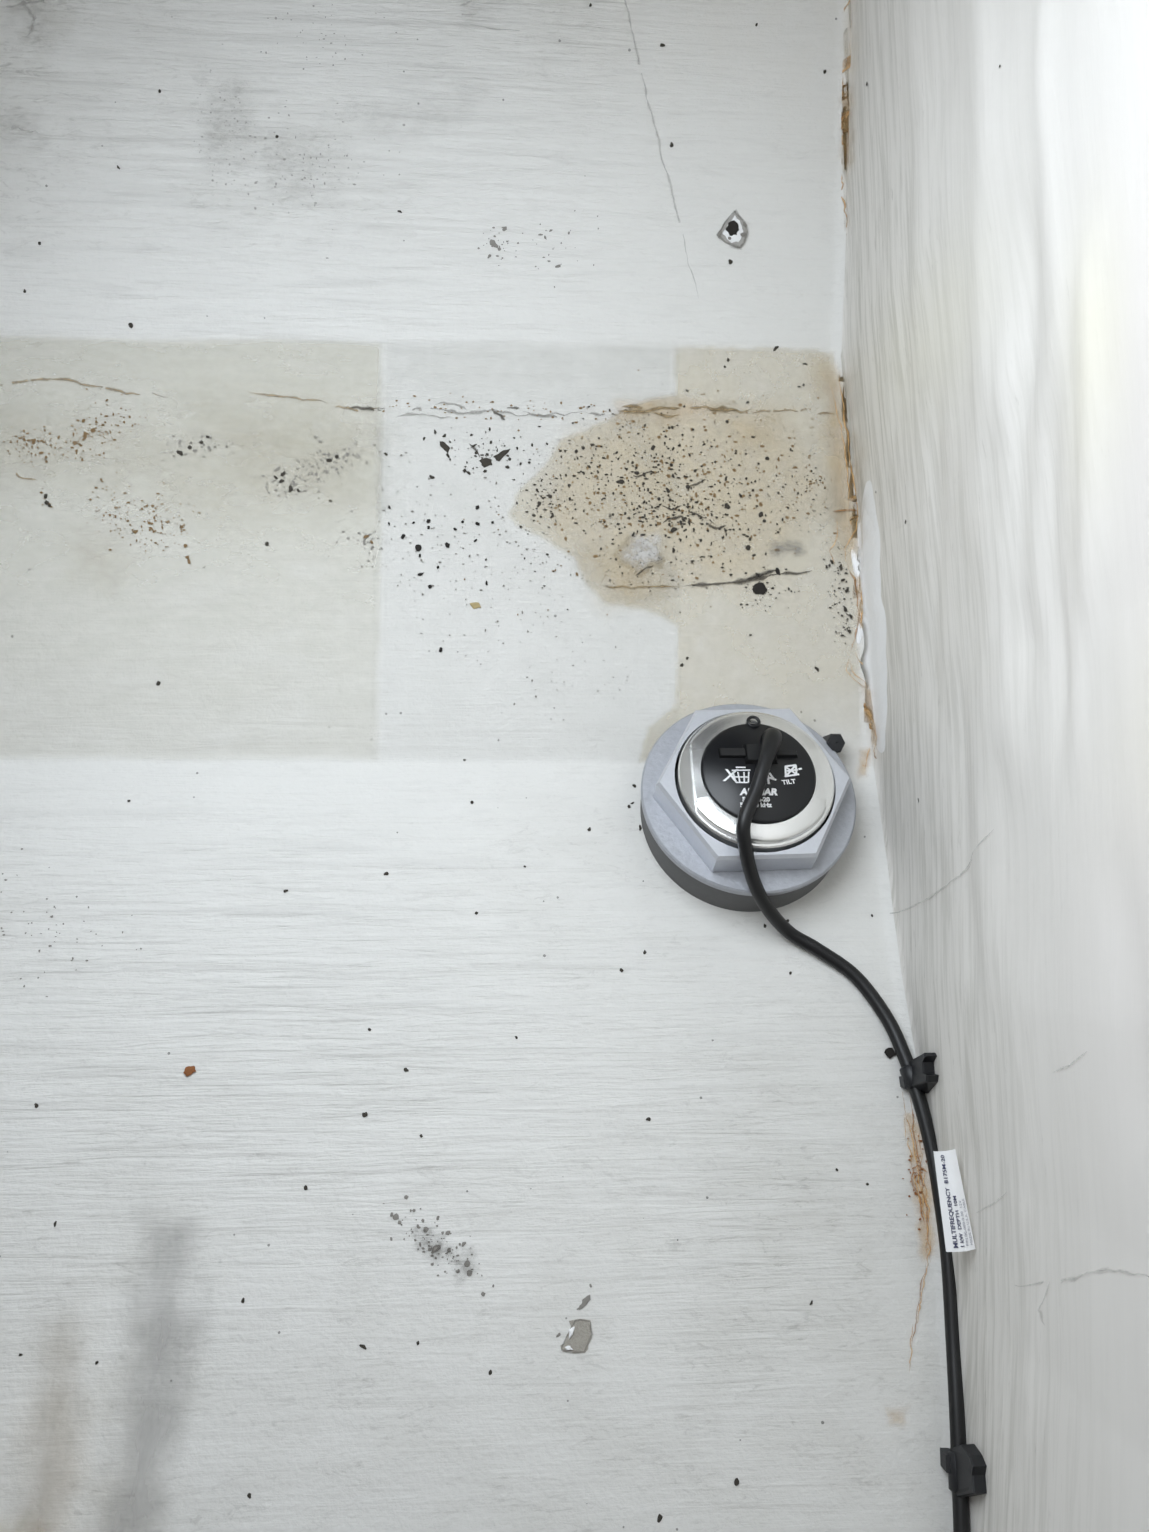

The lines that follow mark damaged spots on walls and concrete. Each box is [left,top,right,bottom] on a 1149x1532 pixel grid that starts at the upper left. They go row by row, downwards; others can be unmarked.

rust [841,54,851,145]
crack [12,378,162,397]
crack [251,392,835,433]
water stain [250,395,837,665]
rust [902,1093,931,1372]